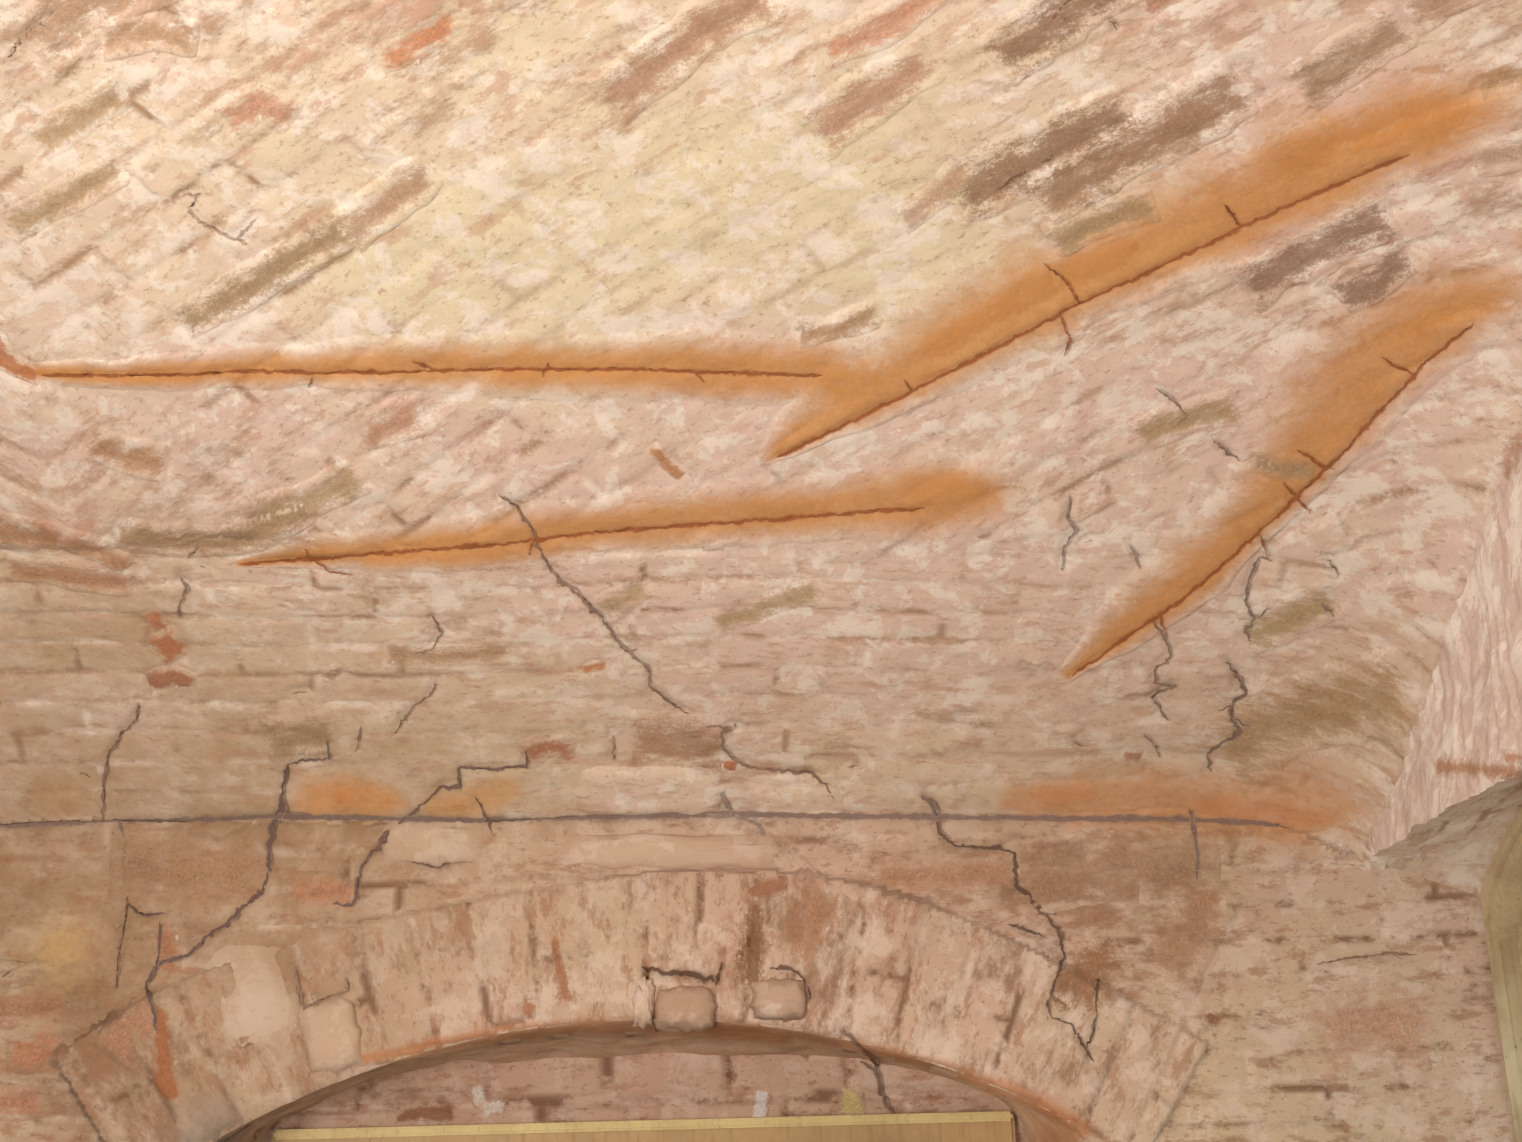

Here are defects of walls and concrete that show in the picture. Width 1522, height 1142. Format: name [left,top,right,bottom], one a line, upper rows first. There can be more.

rust [24,37,1522,576]
crack [1072,324,1473,772]
rust [1054,236,1522,685]
crack [0,494,1290,1063]
rust [988,747,1392,867]